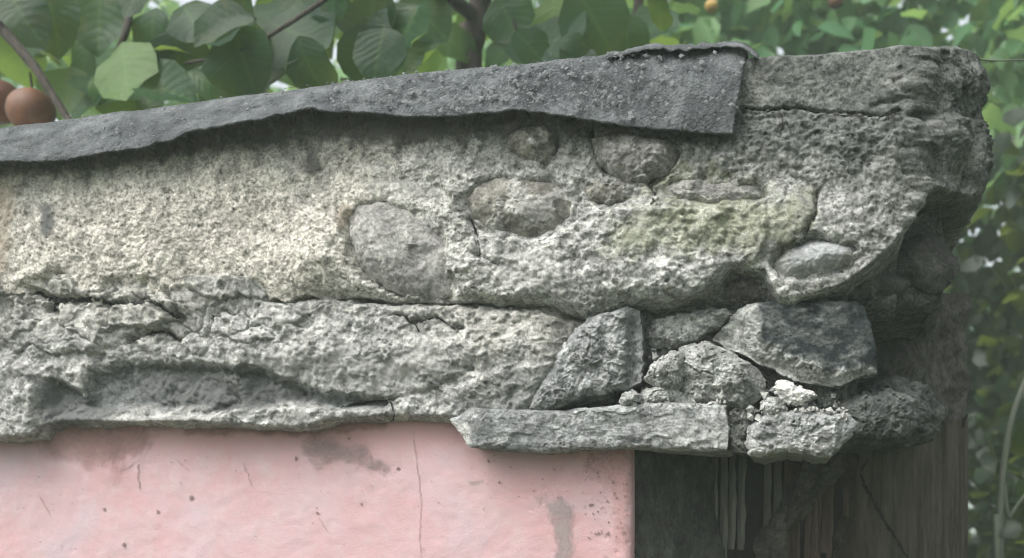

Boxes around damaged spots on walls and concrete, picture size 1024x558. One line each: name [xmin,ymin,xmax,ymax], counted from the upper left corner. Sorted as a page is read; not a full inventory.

crack [745,107,897,135]
crack [392,314,463,332]
crack [341,399,421,552]